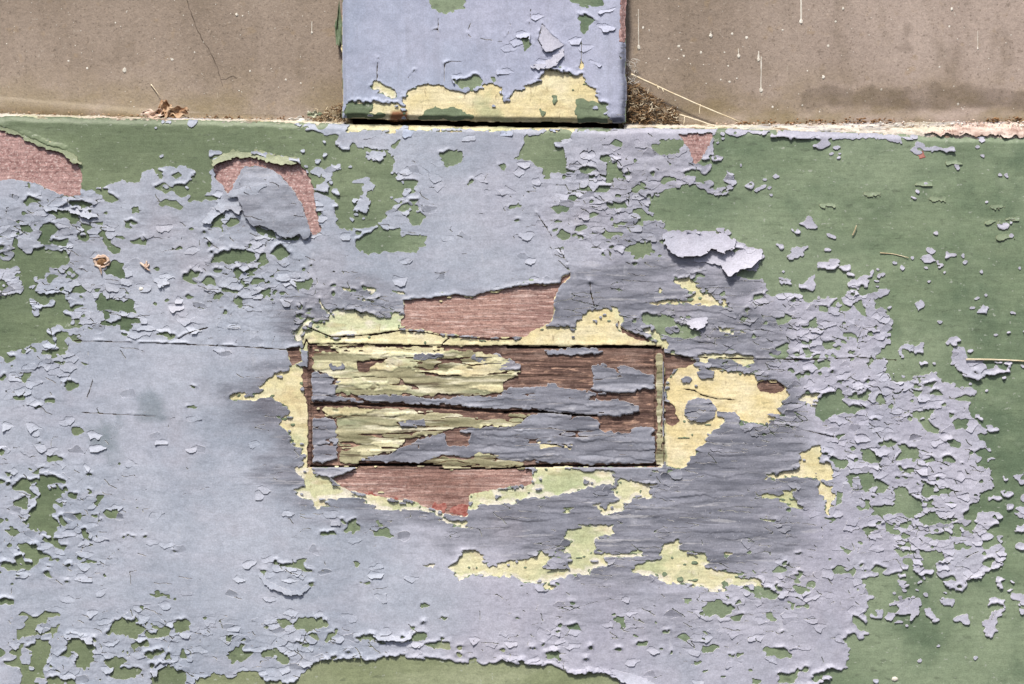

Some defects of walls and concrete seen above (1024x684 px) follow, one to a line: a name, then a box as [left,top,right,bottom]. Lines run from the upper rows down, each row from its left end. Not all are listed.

crack [187,0,236,85]
peeling [429,0,466,14]
peeling [568,0,627,53]
peeling [0,115,444,409]
crack [156,326,744,471]
peeling [225,25,1024,684]
peeling [0,417,125,597]
peeling [0,582,657,684]